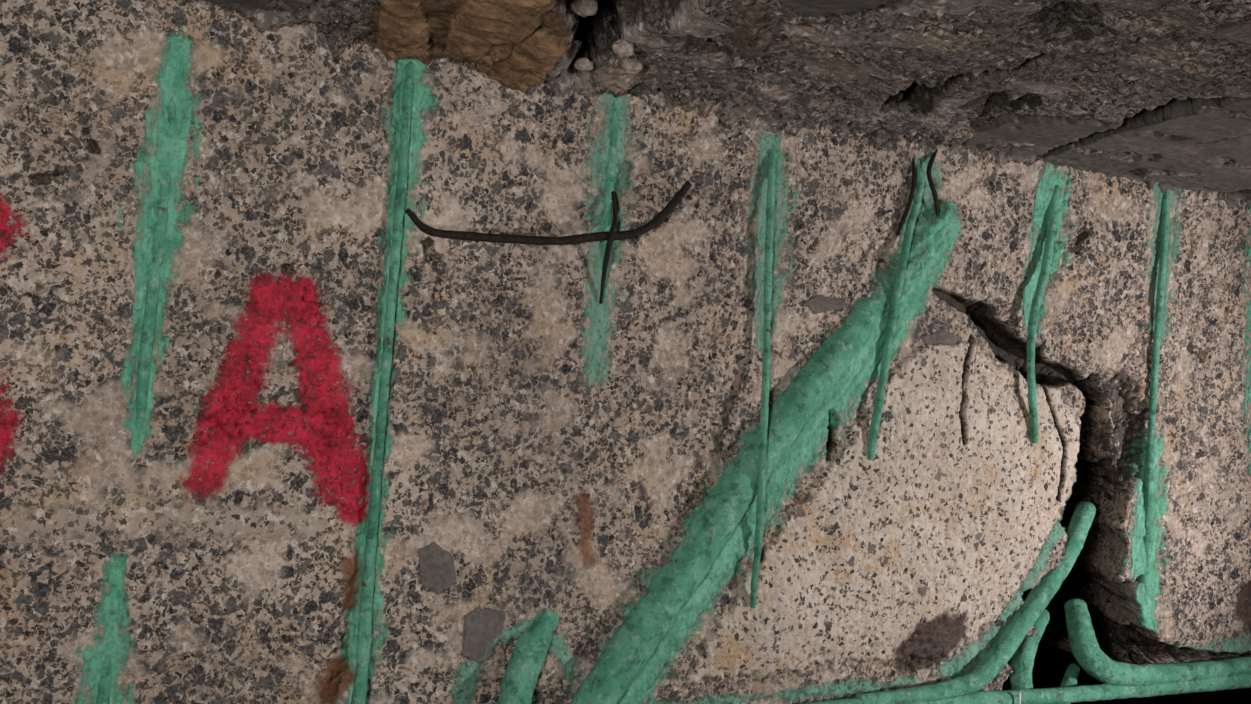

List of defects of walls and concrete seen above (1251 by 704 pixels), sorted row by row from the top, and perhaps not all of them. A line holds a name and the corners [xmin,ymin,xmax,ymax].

spalling [1067,225,1090,255]
flaking render [805,295,846,314]
flaking render [921,330,963,345]
spalling [1186,343,1207,363]
spalling [825,414,836,460]
spalling [1059,372,1147,532]
spalling [1038,524,1251,660]